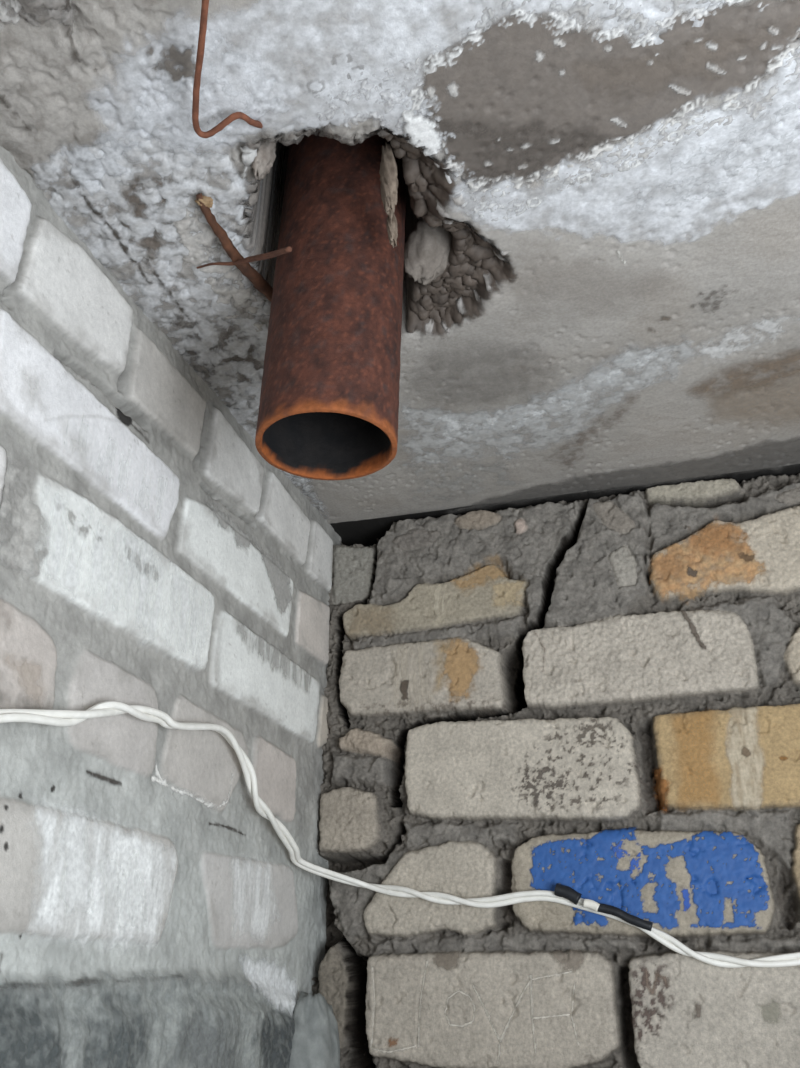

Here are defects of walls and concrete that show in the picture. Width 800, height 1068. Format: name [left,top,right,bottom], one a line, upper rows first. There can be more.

spalling [240,114,517,336]
damp [33,0,800,440]
damp [402,318,800,512]
crack [391,502,588,808]
peeling [530,827,770,929]